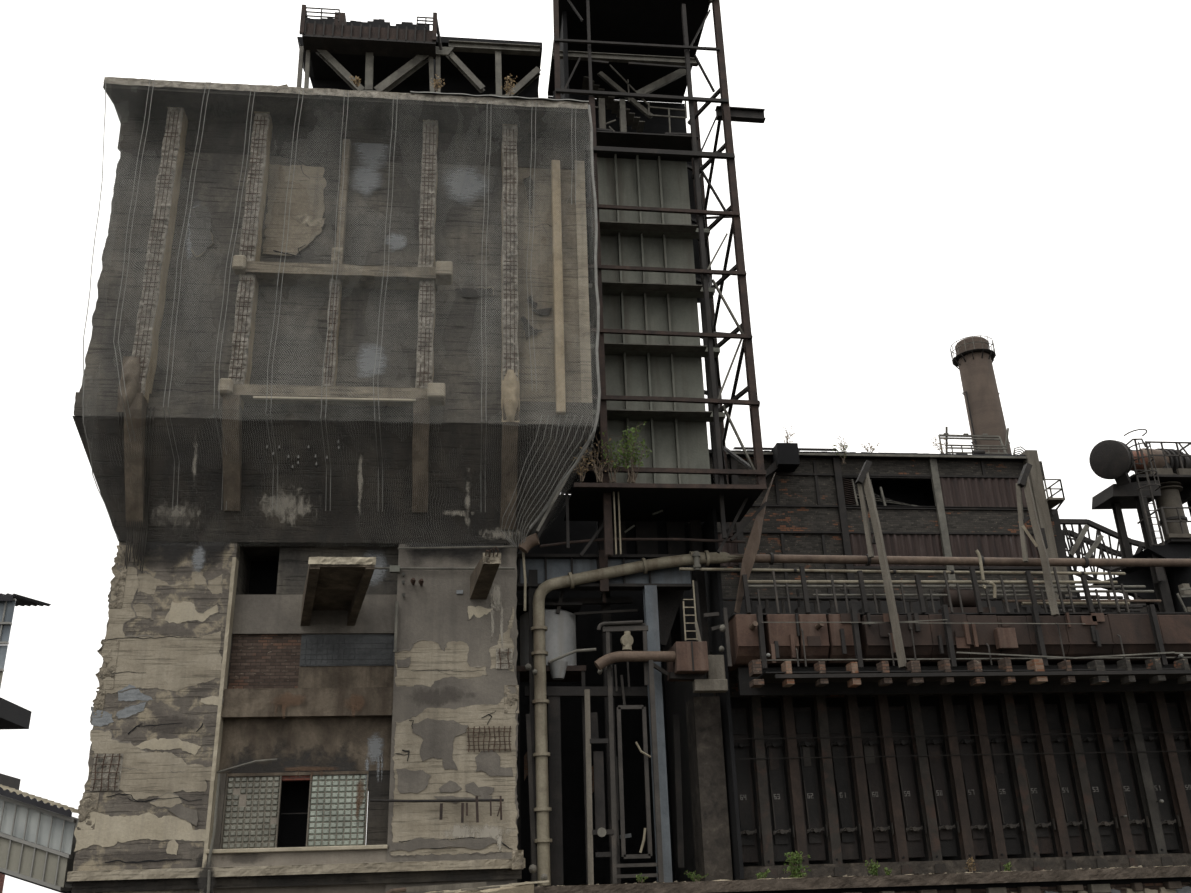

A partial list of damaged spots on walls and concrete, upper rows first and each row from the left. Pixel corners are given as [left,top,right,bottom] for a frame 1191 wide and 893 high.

peeling [74,545,224,855]
peeling [388,606,524,869]